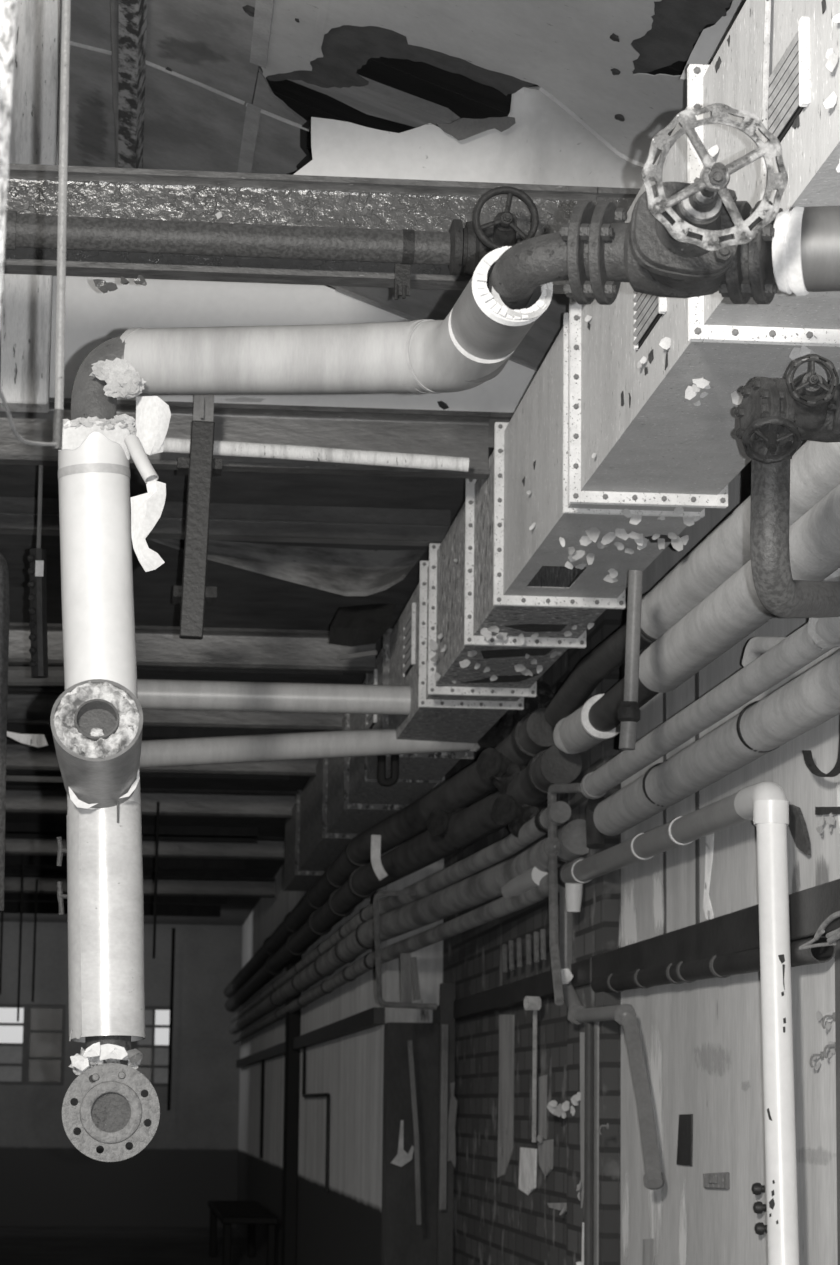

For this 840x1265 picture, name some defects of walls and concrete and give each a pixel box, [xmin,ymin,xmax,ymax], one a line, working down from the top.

peeling [821,0,840,23]
peeling [825,48,839,72]
peeling [823,91,837,109]